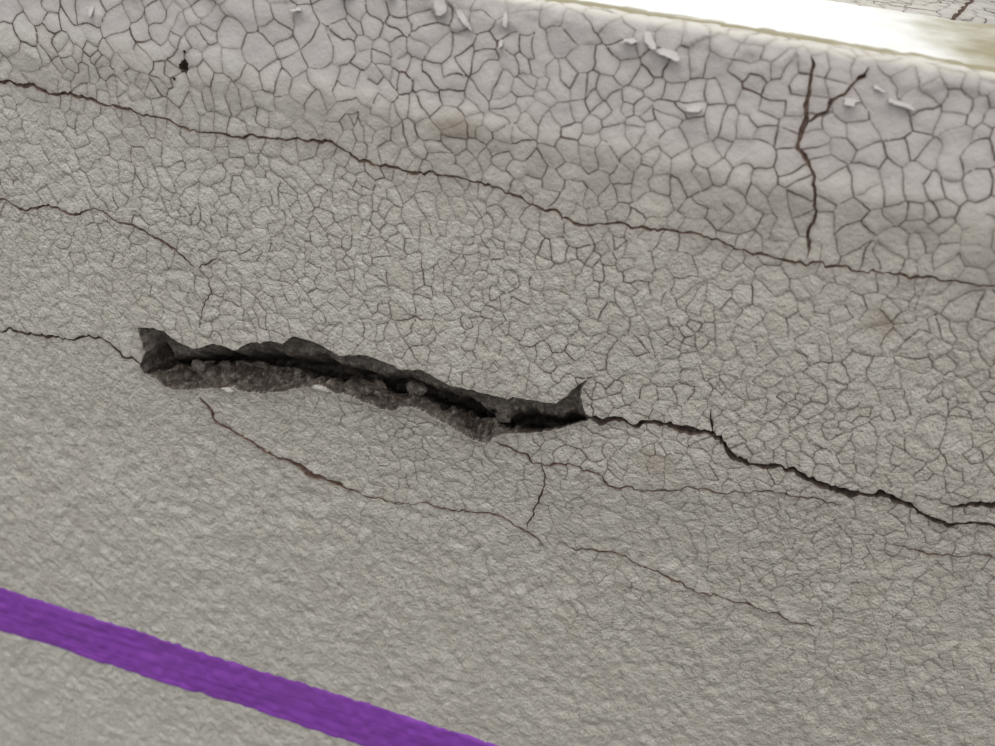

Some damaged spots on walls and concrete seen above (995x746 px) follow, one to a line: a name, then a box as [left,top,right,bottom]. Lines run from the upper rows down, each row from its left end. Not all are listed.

crack [0,0,995,357]
crack [1,327,142,365]
spalling [138,328,590,445]
crack [200,313,995,627]